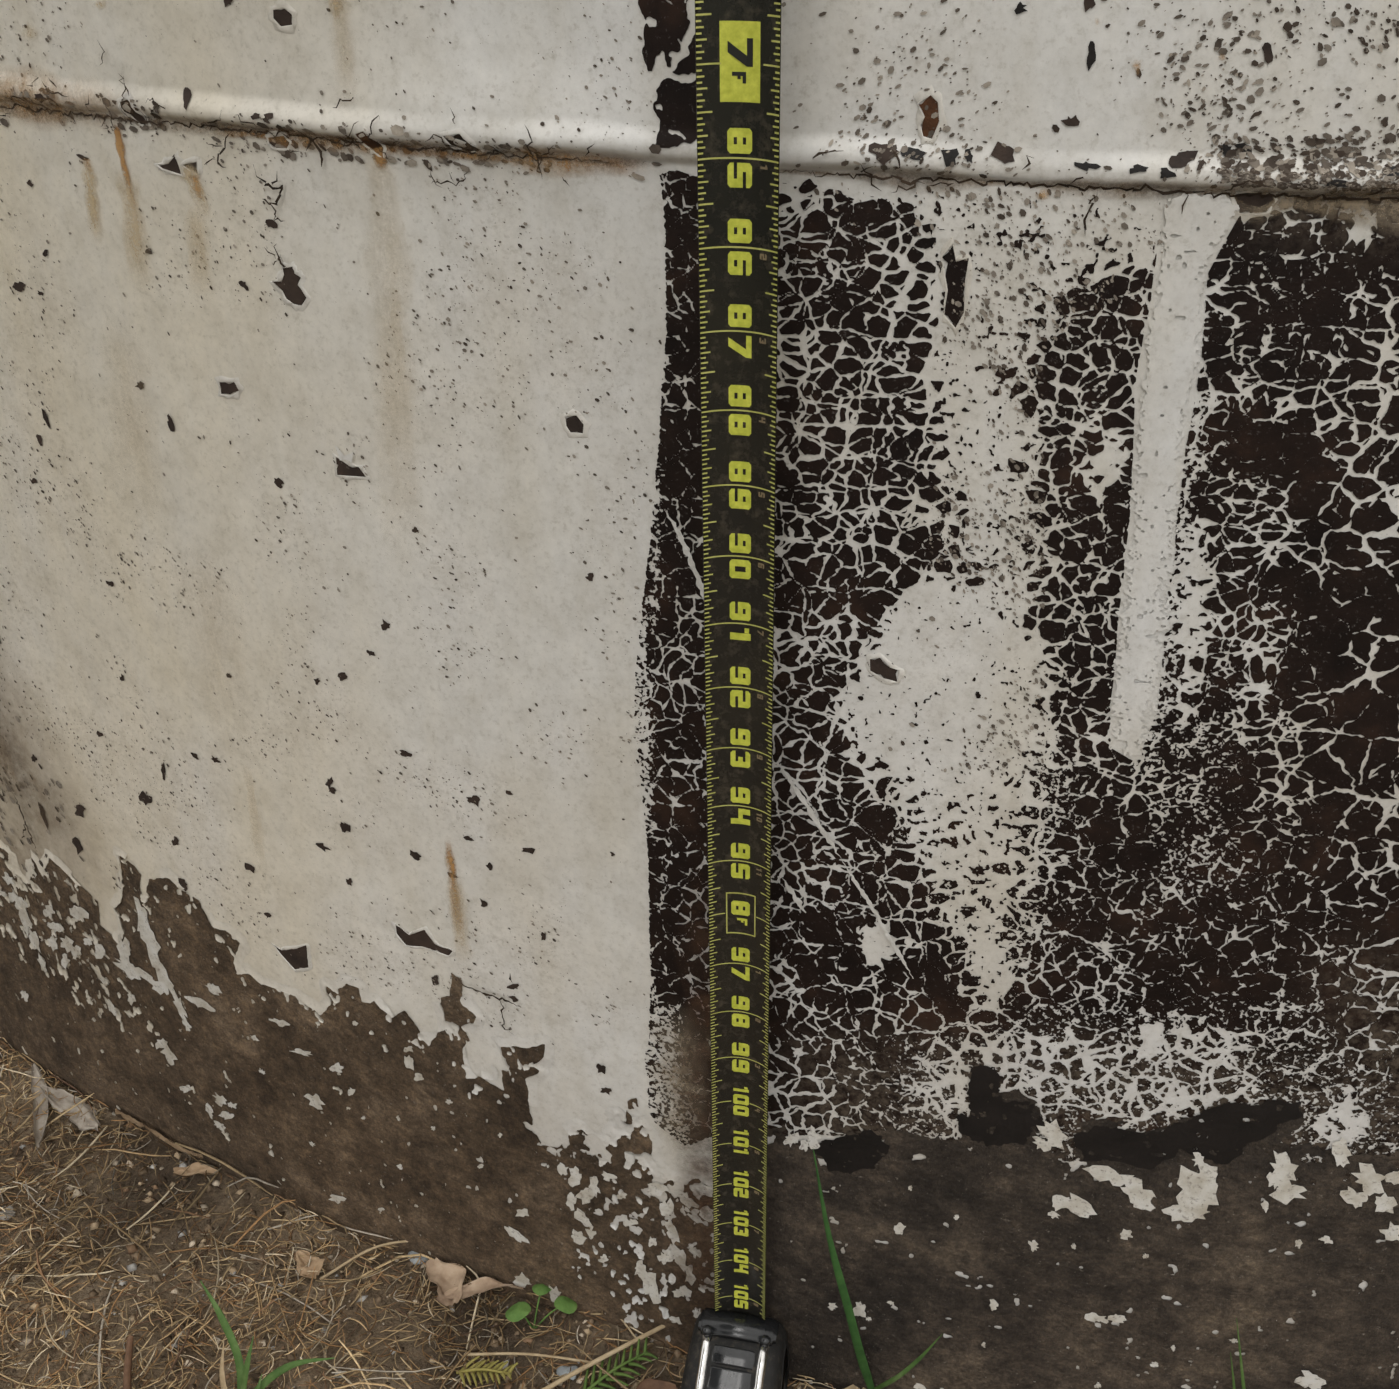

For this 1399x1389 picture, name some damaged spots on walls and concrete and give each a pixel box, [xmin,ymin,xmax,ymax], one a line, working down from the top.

peeling [154,151,203,179]
rust [2,82,621,257]
peeling [0,170,715,1354]
peeling [765,179,1399,1389]
rust [447,849,461,922]